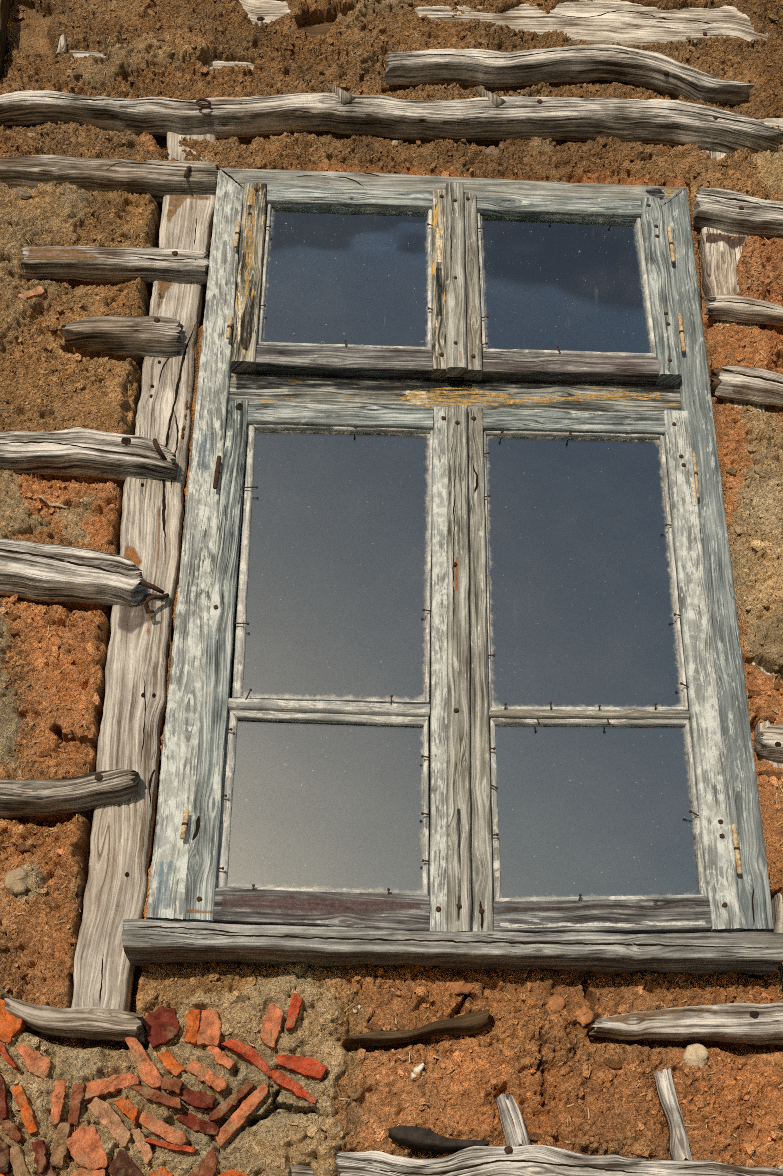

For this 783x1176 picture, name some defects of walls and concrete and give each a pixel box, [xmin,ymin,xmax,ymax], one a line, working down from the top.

peeling [236,373,674,407]
crack [535,1025,549,1108]